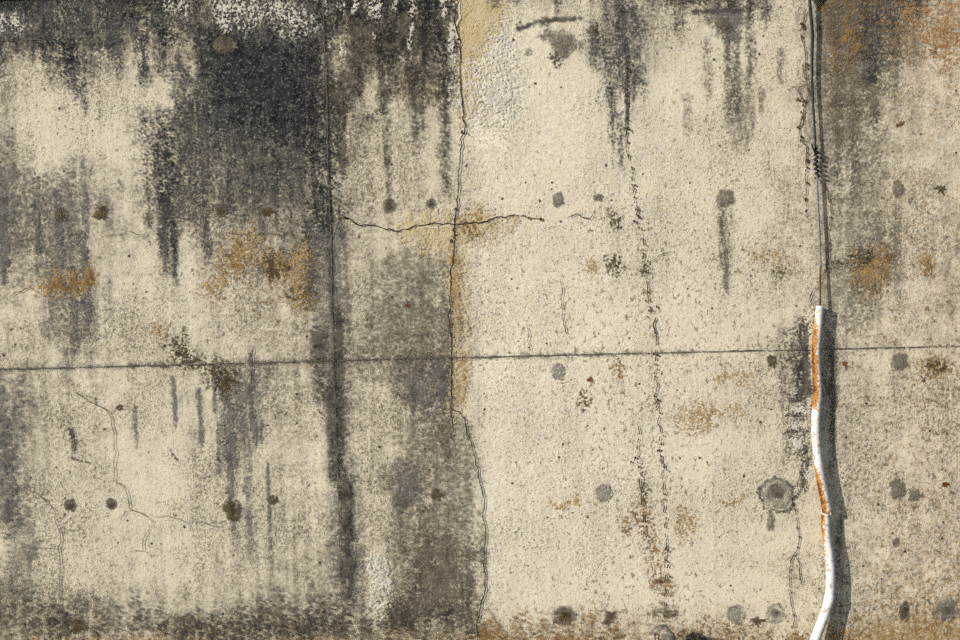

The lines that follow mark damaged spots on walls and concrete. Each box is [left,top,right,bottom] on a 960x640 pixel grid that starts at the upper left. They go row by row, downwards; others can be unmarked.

water stain [584,0,647,166]
water stain [648,0,771,143]
rust [817,0,867,72]
rust [898,0,960,71]
water stain [0,0,522,640]
crack [339,0,595,640]
crack [623,58,678,625]
water stain [717,205,733,293]
crack [789,456,806,628]